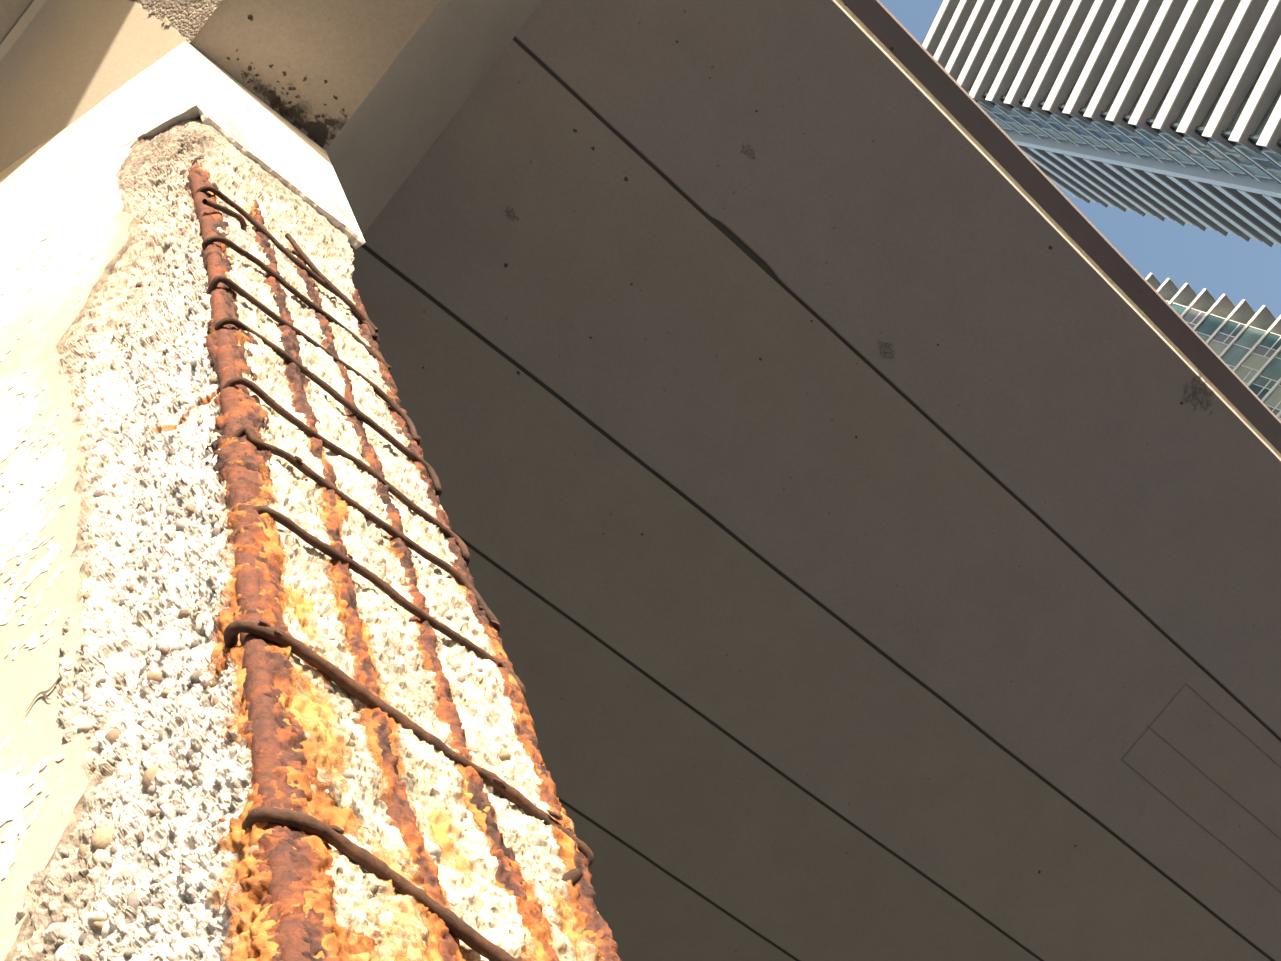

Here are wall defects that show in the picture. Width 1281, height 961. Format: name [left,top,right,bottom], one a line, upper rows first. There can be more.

flaking render [127,0,222,44]
leakage [226,49,346,148]
rust [151,391,220,432]
spalling [0,91,622,961]
rust [208,437,471,961]
rust [456,568,545,781]
rust [414,621,602,961]